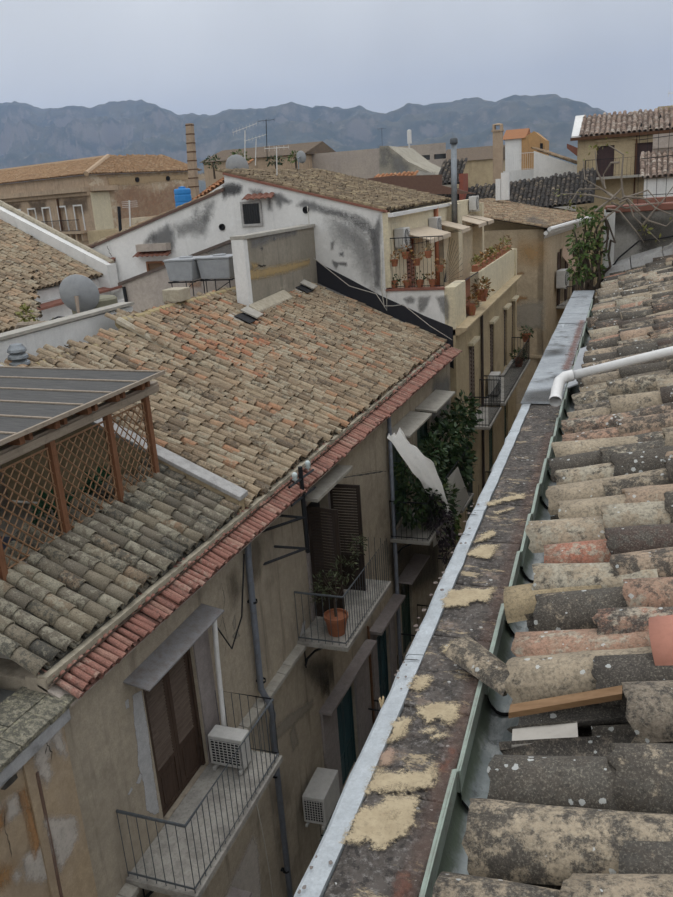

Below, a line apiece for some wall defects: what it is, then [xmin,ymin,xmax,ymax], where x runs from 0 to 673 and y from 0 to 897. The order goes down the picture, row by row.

damp [223,185,241,196]
damp [147,204,212,249]
damp [252,231,296,245]
damp [300,201,380,286]